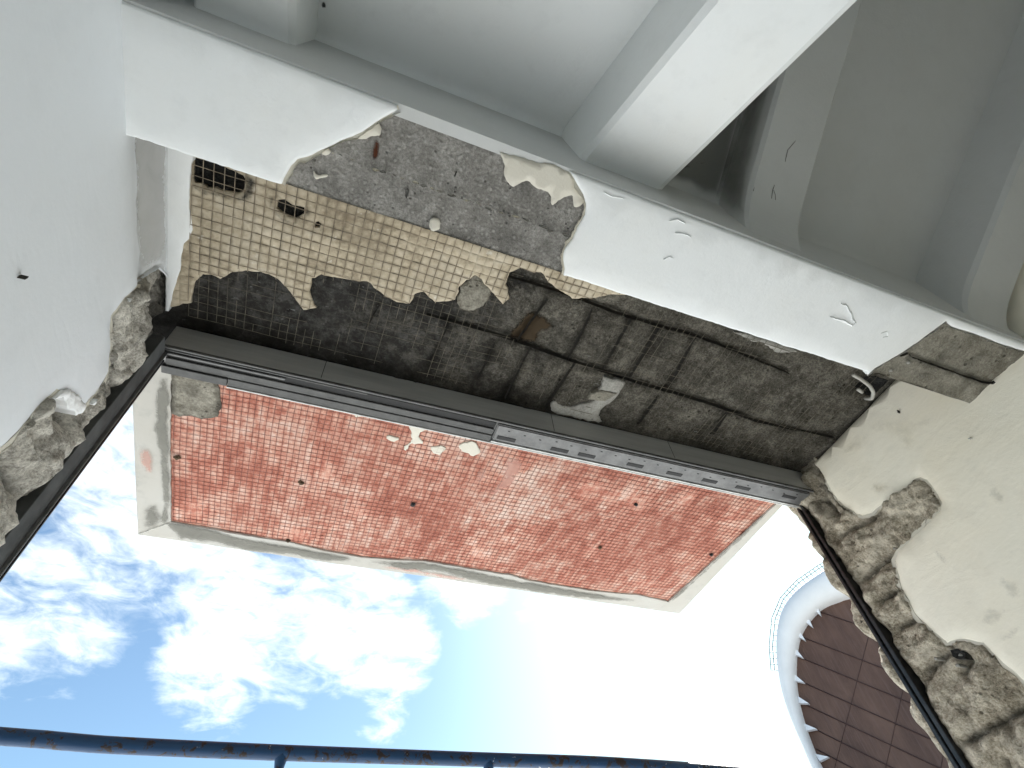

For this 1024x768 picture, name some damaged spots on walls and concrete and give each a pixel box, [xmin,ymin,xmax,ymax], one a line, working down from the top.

spalling [194,158,254,198]
spalling [271,199,321,226]
spalling [282,105,586,274]
spalling [0,268,1024,768]